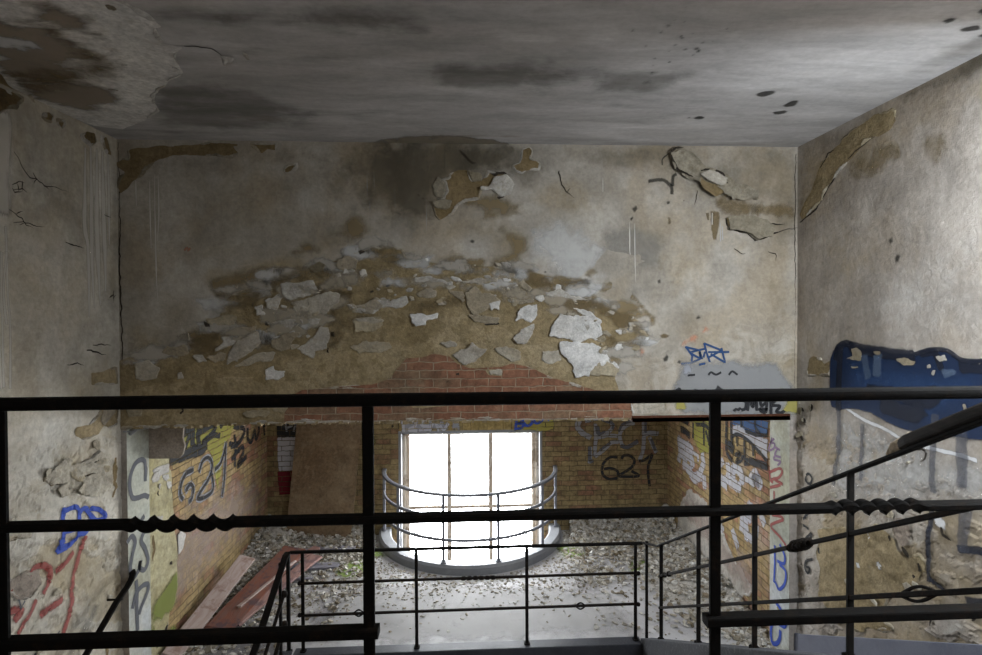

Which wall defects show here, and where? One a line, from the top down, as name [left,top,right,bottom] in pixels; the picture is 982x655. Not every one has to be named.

peeling [0,0,238,193]
leakage [368,136,508,227]
peeling [417,147,541,220]
crack [104,143,123,360]
peeling [91,236,659,396]
peeling [43,407,362,498]
flaking render [374,403,634,428]
peeling [9,533,32,542]
peeling [10,569,42,601]
peeling [839,622,894,633]
peeling [816,511,927,608]